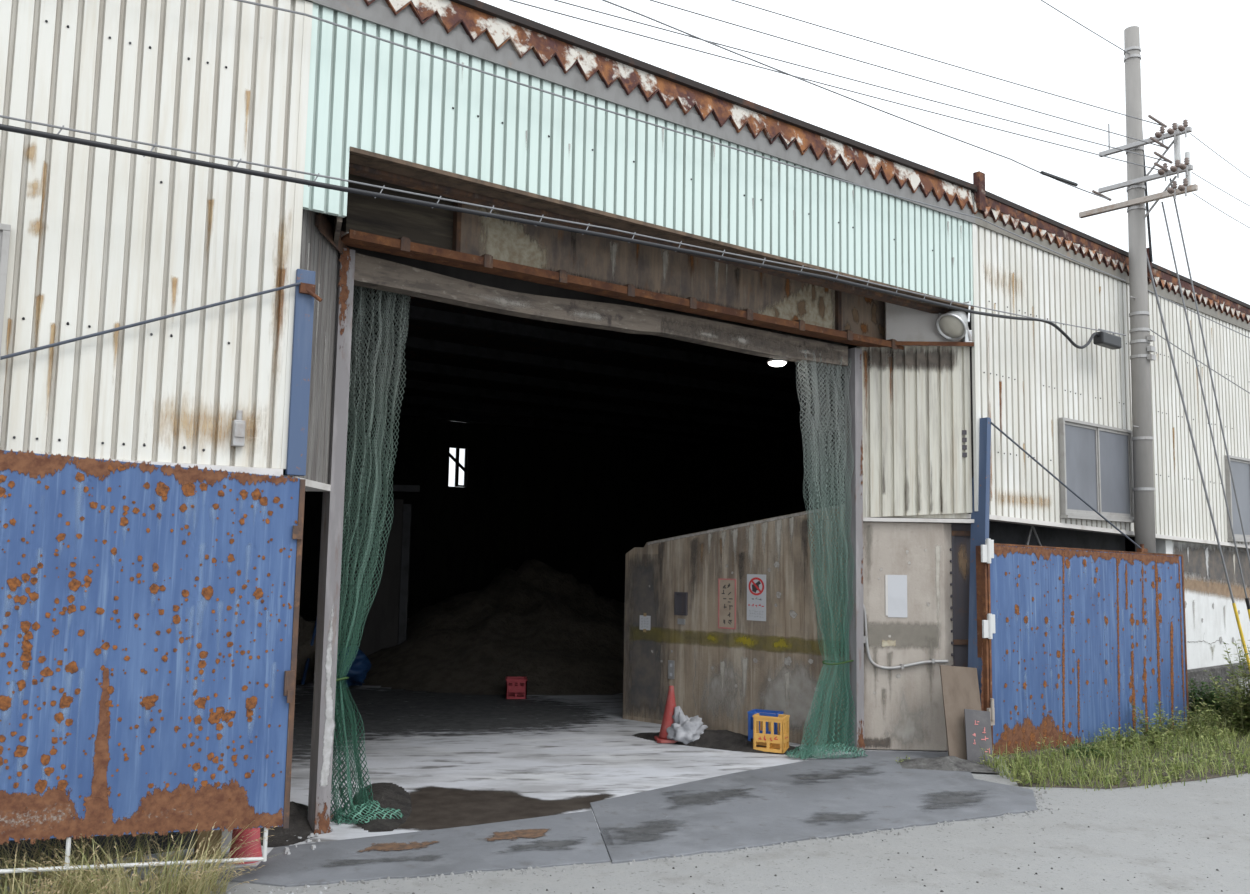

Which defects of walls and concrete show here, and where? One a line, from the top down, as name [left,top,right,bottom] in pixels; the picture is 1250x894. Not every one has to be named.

corrosion [276,228,286,352]
corrosion [338,247,351,349]
corrosion [0,449,298,845]
corrosion [993,545,1185,757]